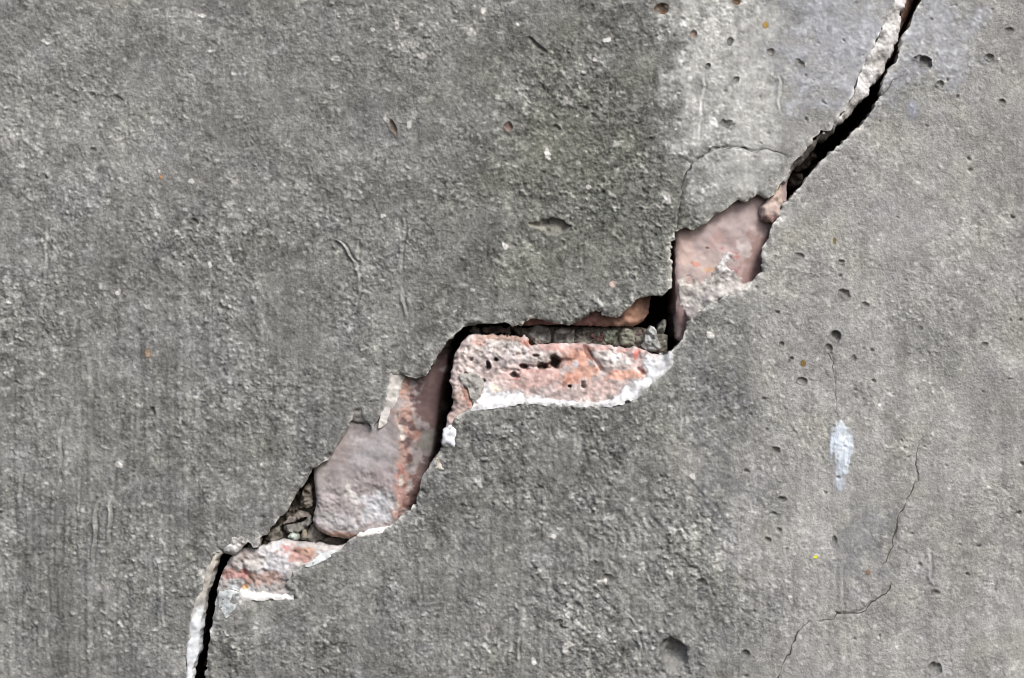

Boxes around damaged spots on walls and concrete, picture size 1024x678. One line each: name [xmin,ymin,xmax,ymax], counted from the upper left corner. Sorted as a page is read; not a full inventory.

crack [677,0,919,228]
crack [458,322,577,342]
flaking render [209,0,921,632]
crack [634,291,677,354]
crack [186,550,232,678]
crack [777,441,921,678]